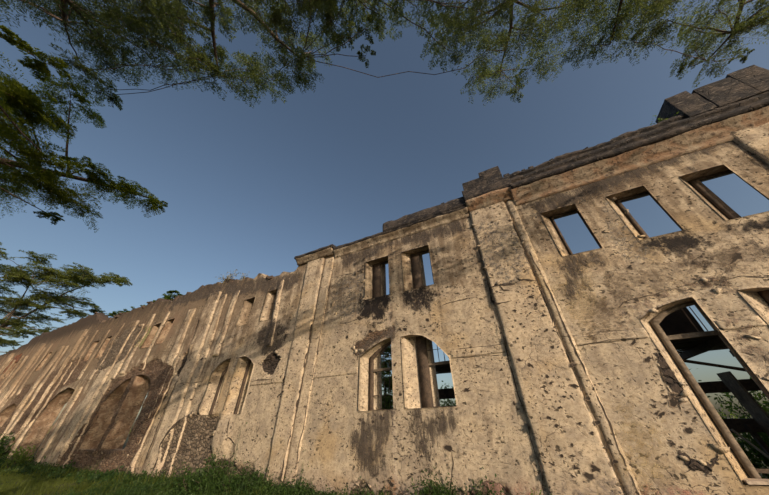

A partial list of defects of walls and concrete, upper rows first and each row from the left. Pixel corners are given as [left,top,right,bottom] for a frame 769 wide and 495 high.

damp [640,216,769,283]
flaking render [0,325,148,436]
flaking render [54,350,204,475]
damp [85,272,302,348]
flaking render [154,412,258,479]
damp [253,319,288,355]
spalling [257,350,292,399]
damp [351,404,396,479]
damp [352,286,440,363]
damp [409,408,457,473]
crack [440,212,682,495]
crack [616,276,764,311]